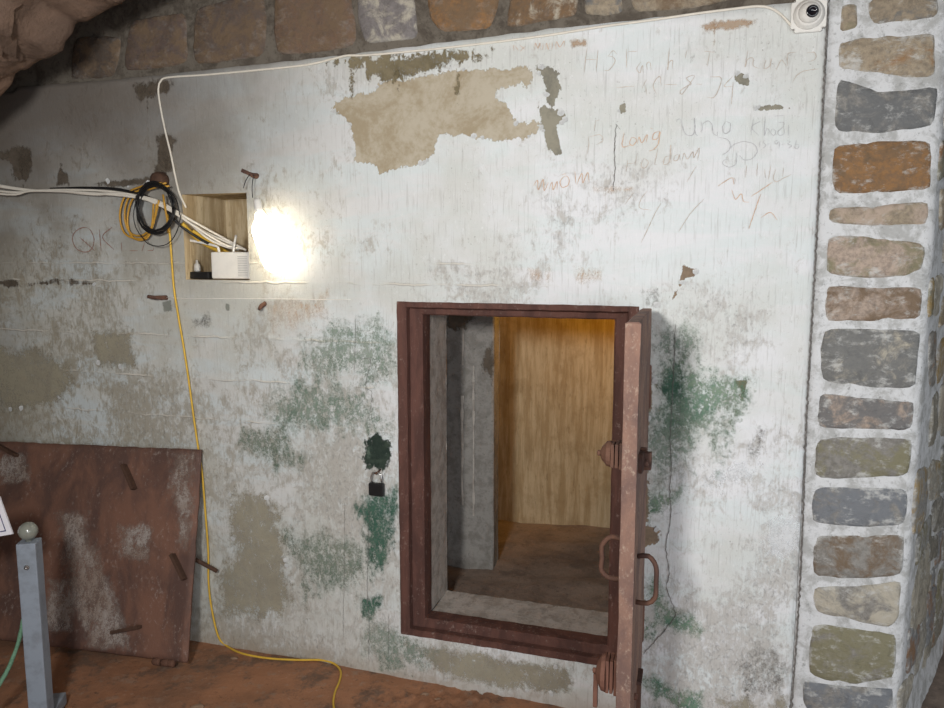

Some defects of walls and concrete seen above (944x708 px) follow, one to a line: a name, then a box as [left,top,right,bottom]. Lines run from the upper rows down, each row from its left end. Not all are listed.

peeling [332,64,568,175]
spalling [672,265,699,299]
leakage [238,414,303,467]
leakage [354,486,398,569]
leakage [362,429,391,472]
spalling [645,470,661,547]
crack [644,324,681,653]